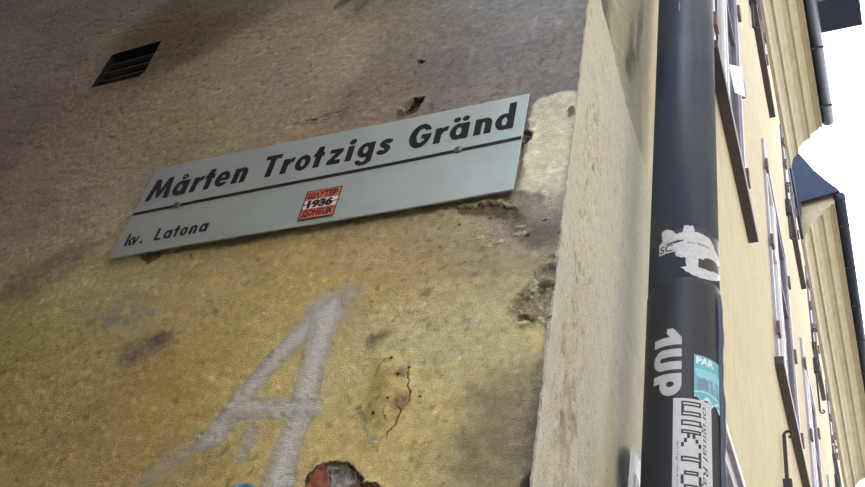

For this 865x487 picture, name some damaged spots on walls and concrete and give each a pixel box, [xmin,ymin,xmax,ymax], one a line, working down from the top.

flaking render [457,198,529,247]
flaking render [509,251,558,332]
flaking render [305,460,382,487]